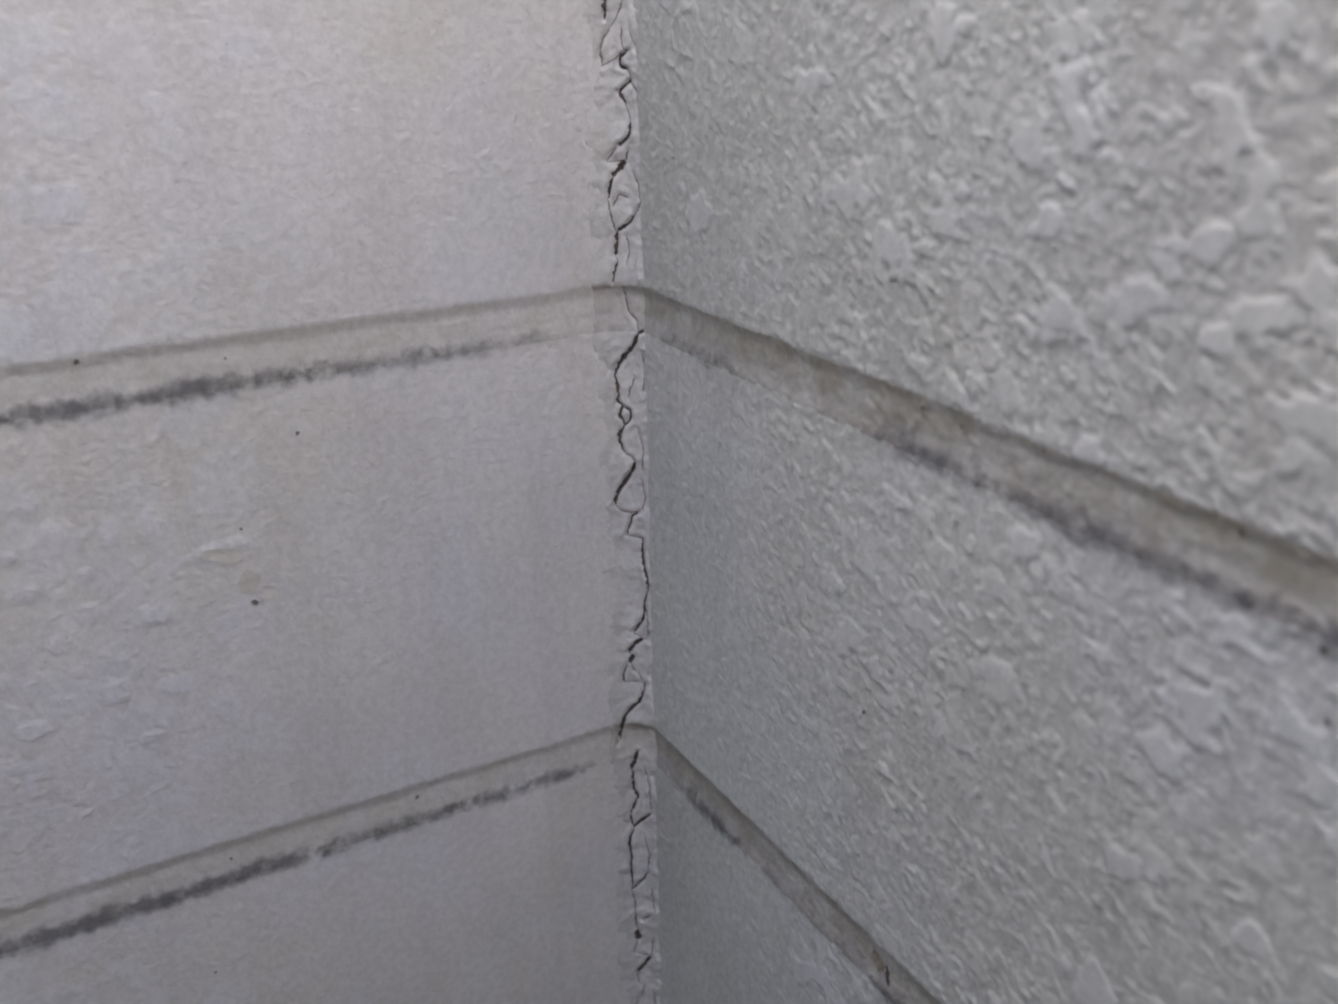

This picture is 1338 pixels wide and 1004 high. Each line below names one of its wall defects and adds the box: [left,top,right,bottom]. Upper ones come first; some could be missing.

crack [599,0,656,1004]